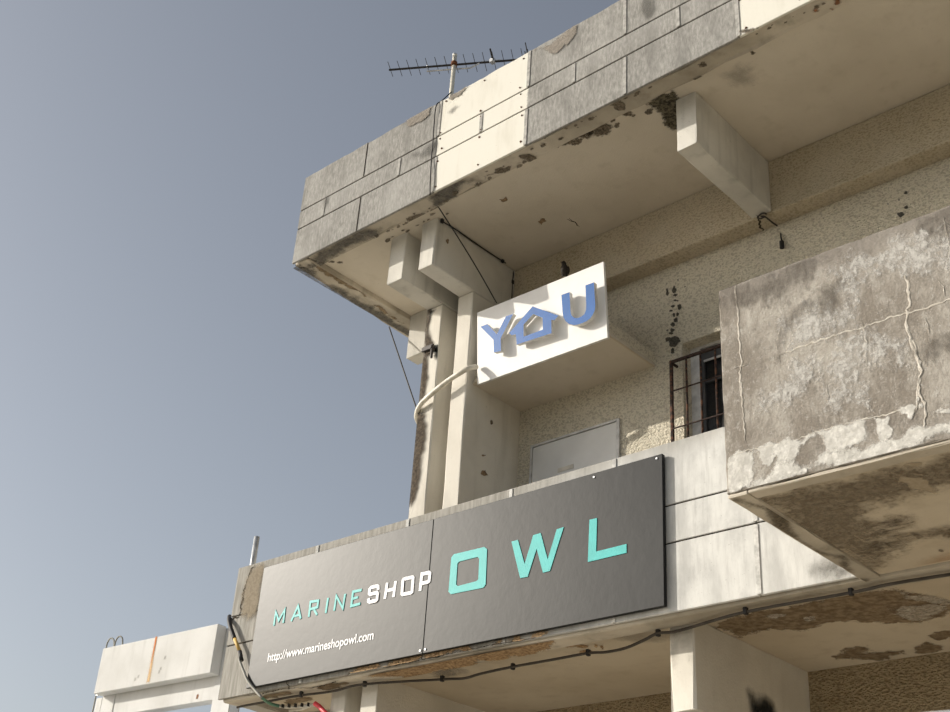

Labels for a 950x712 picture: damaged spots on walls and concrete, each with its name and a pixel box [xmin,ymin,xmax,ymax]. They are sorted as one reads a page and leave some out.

spalling [559,86,679,145]
spalling [475,138,546,186]
spalling [375,191,458,242]
water stain [430,181,464,207]
water stain [294,230,409,336]
crack [732,272,950,456]
peeling [727,396,950,493]
water stain [752,456,950,571]
peeling [716,588,950,638]
peeling [831,630,950,661]